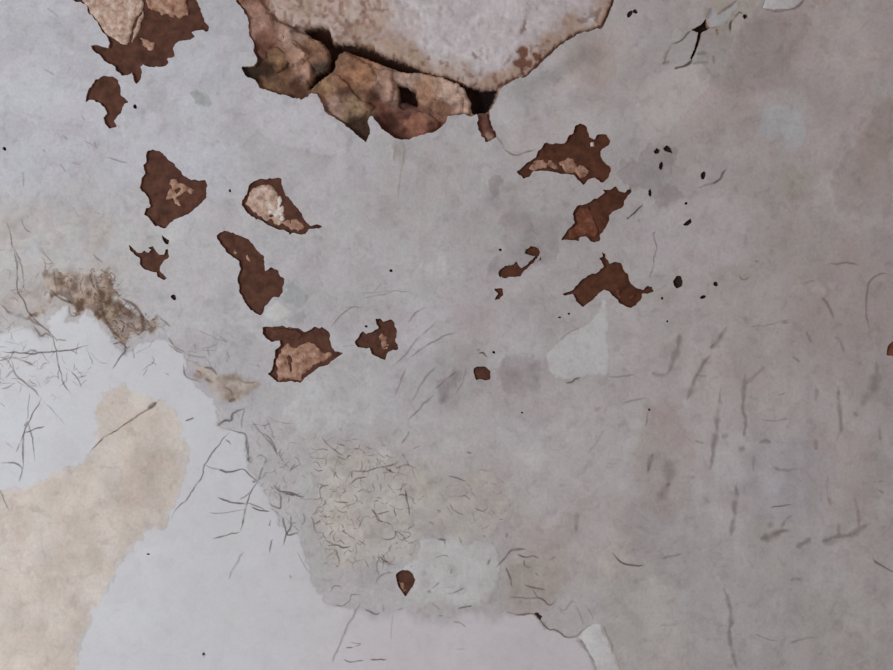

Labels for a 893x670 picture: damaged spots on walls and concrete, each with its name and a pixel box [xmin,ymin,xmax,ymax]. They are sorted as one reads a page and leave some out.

damp [0,192,156,350]
flaking render [74,0,209,128]
flaking render [129,150,207,280]
flaking render [217,231,343,383]
flaking render [242,178,322,235]
peeling [241,92,348,157]
flaking render [494,246,541,300]
flaking render [517,124,631,242]
peeling [546,253,663,383]
crack [665,0,740,69]
damp [0,382,191,670]
peeling [0,306,621,670]